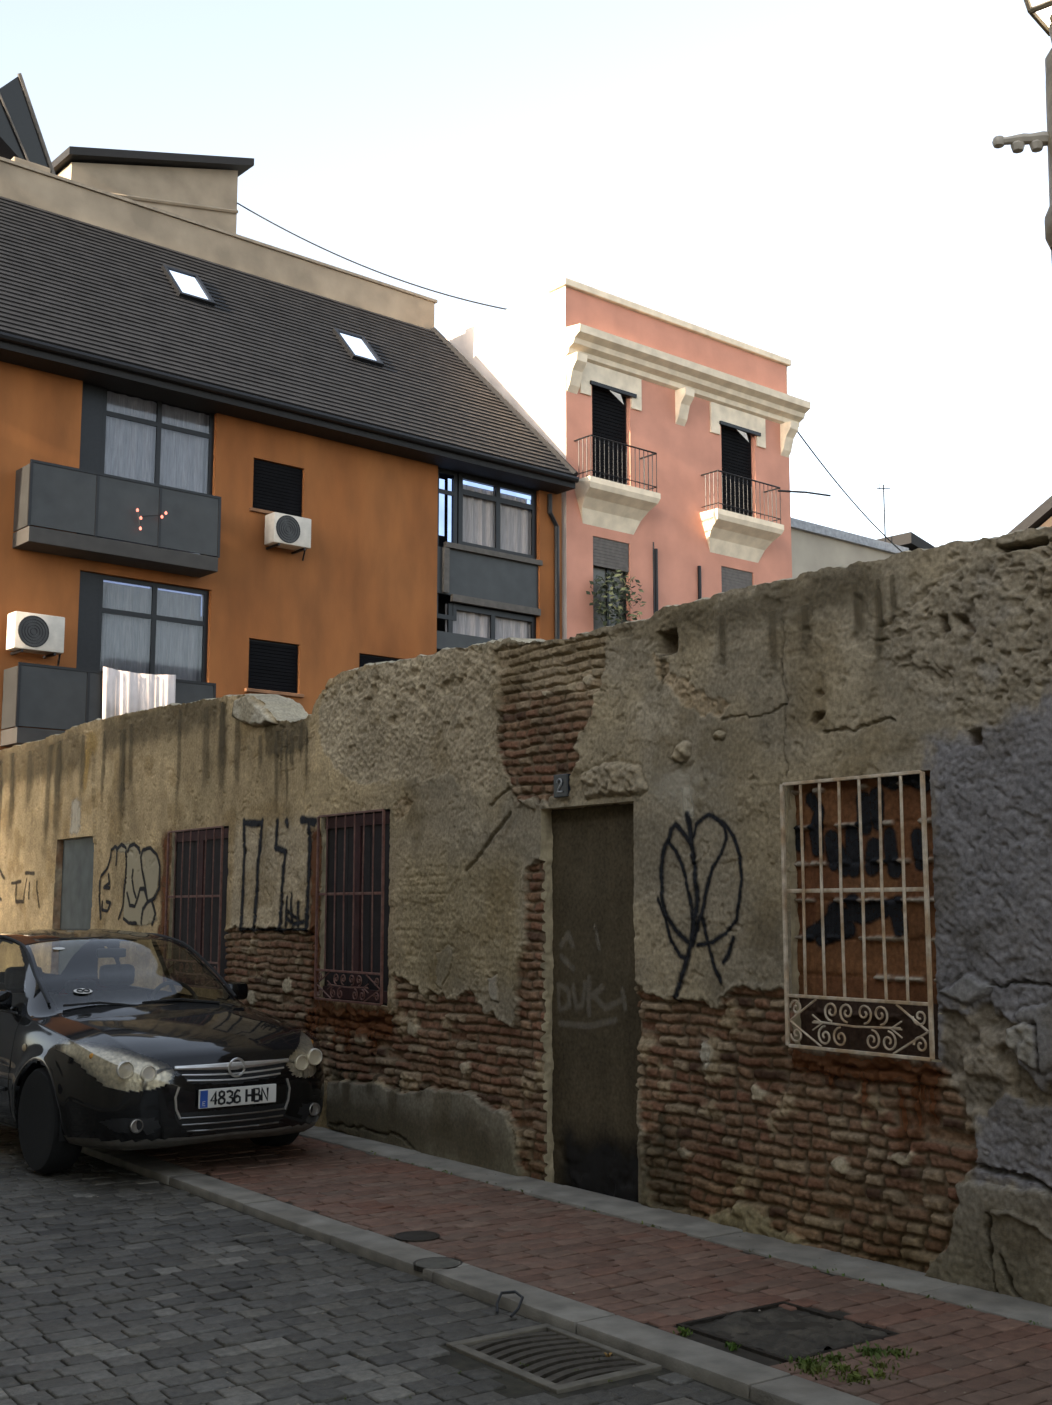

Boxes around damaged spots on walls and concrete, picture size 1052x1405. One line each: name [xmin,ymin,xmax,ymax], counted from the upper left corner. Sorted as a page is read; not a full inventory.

flaking render [318,628,612,809]
flaking render [217,855,548,1181]
flaking render [634,975,1052,1273]
crack [975,1162,1052,1297]